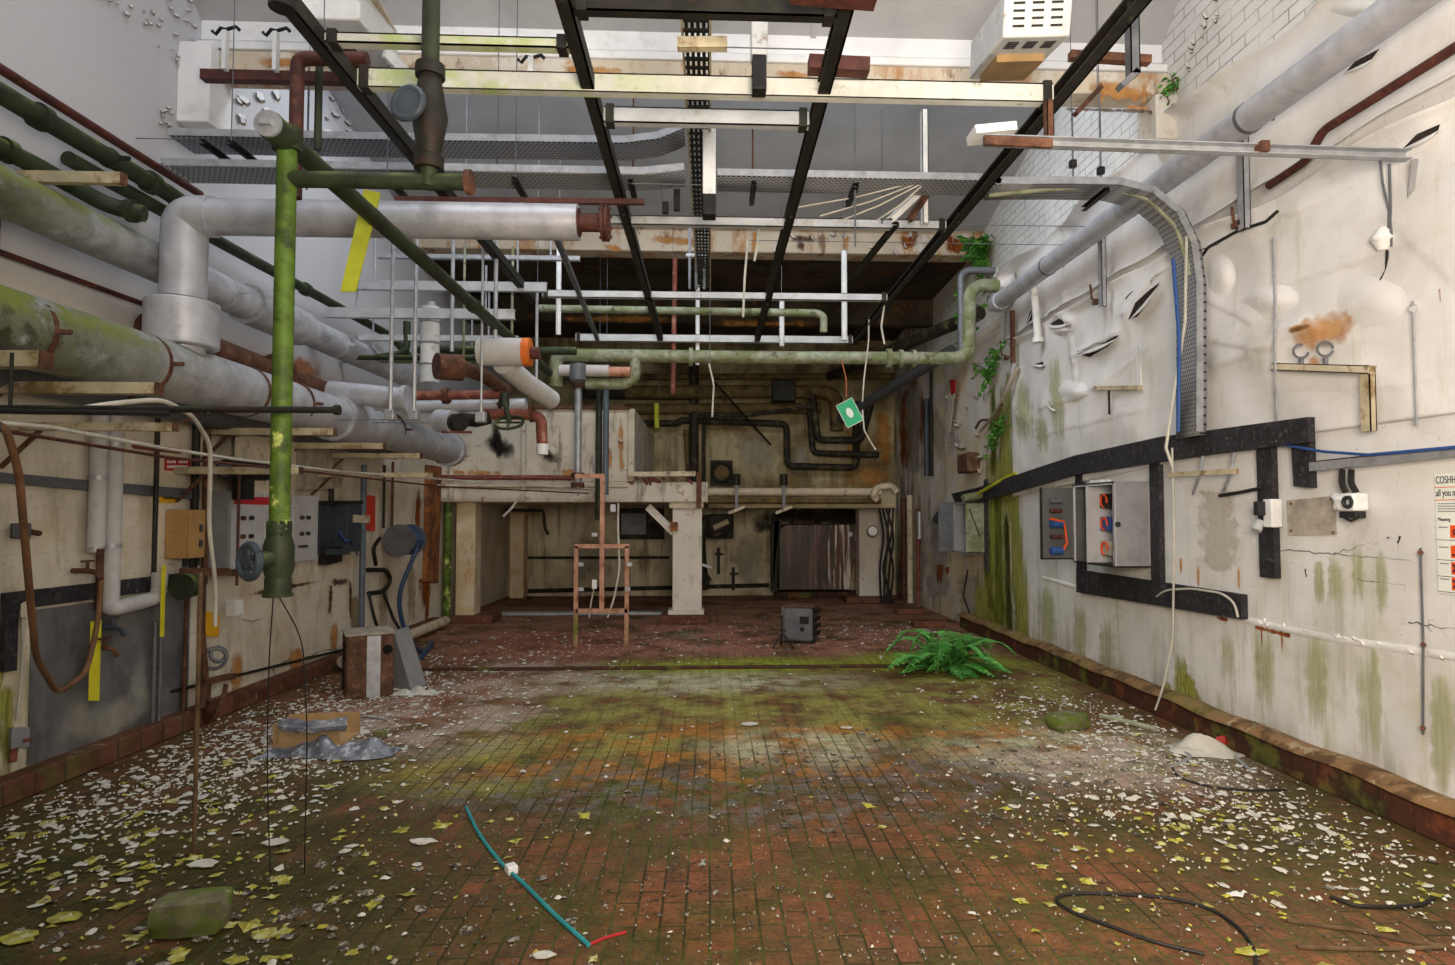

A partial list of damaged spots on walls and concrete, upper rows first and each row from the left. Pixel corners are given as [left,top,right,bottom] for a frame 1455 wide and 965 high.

rust [655,236,693,245]
rust [947,236,968,254]
rust [1292,317,1350,364]
leakage [920,374,1029,636]
leakage [0,672,13,772]